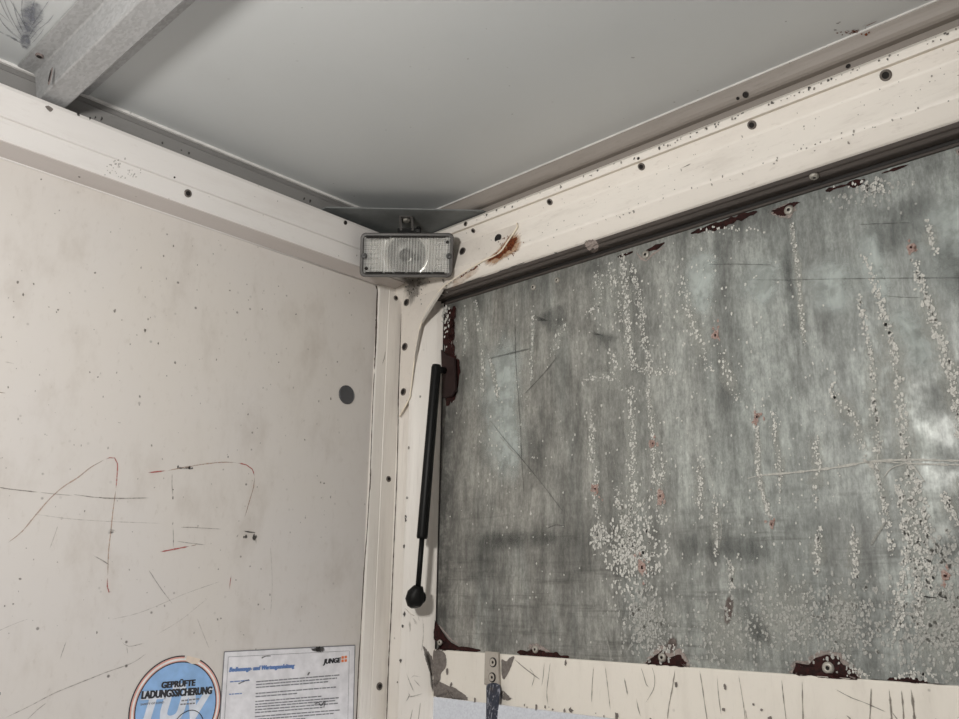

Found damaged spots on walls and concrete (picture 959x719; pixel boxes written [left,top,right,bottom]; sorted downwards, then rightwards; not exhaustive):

corrosion [461,235,524,277]
peeling [423,646,476,703]